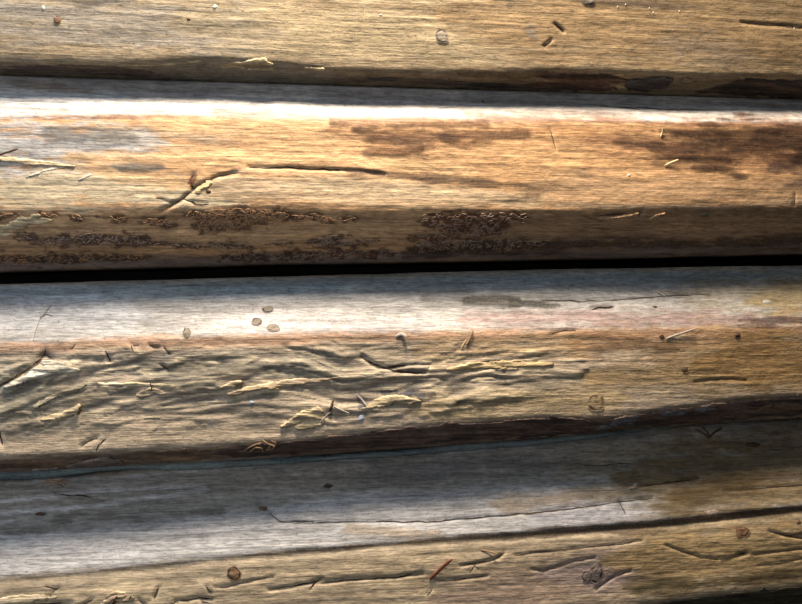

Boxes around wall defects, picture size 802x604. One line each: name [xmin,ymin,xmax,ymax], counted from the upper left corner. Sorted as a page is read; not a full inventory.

leakage [329,120,530,155]
leakage [648,112,802,179]
crack [260,166,383,175]
crack [270,479,694,524]